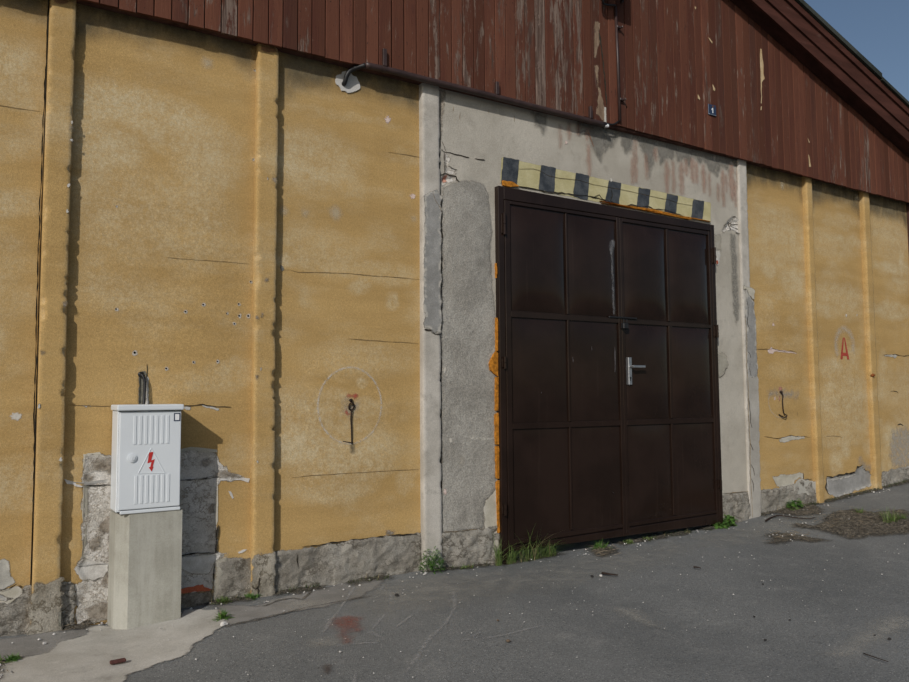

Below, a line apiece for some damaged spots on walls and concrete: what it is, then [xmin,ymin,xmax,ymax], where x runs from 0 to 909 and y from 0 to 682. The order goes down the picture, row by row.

damp [578,122,798,185]
crack [280,265,410,279]
crack [356,112,484,493]
spalling [773,465,872,497]
spalling [64,452,112,625]
spalling [180,447,250,609]
peeling [0,559,23,604]